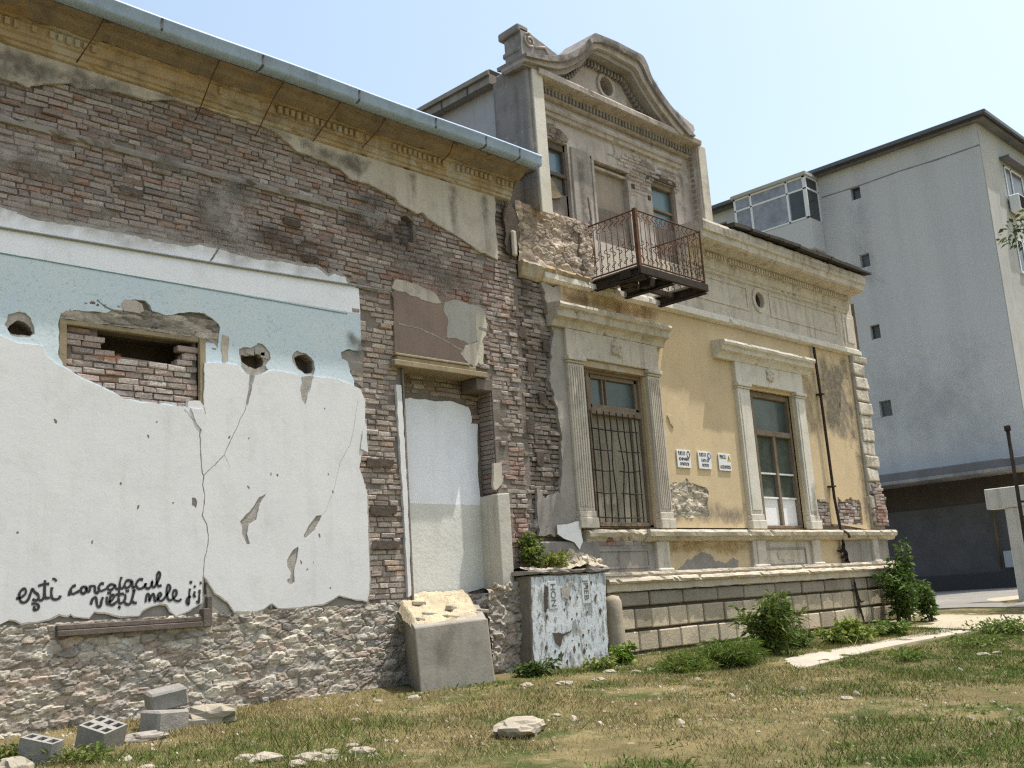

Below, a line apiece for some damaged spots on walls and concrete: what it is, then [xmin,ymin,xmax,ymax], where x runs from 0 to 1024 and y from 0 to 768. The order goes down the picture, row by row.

damp [0,53,53,81]
flaking render [0,79,561,625]
damp [820,360,854,436]
crack [185,405,247,577]
flaking render [670,479,709,518]
flaking render [817,482,889,526]
peeling [538,580,605,664]